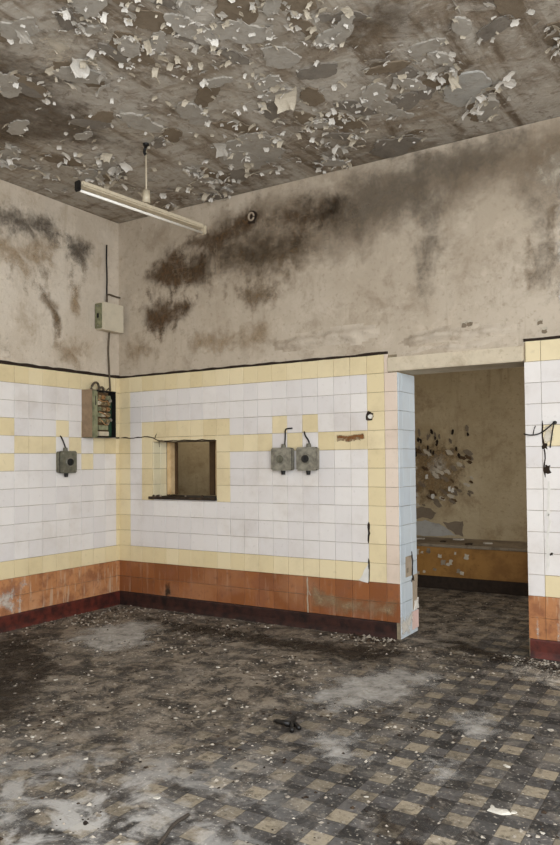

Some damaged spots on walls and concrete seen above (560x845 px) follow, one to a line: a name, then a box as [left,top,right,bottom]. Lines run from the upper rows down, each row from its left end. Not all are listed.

peeling [0,0,560,210]